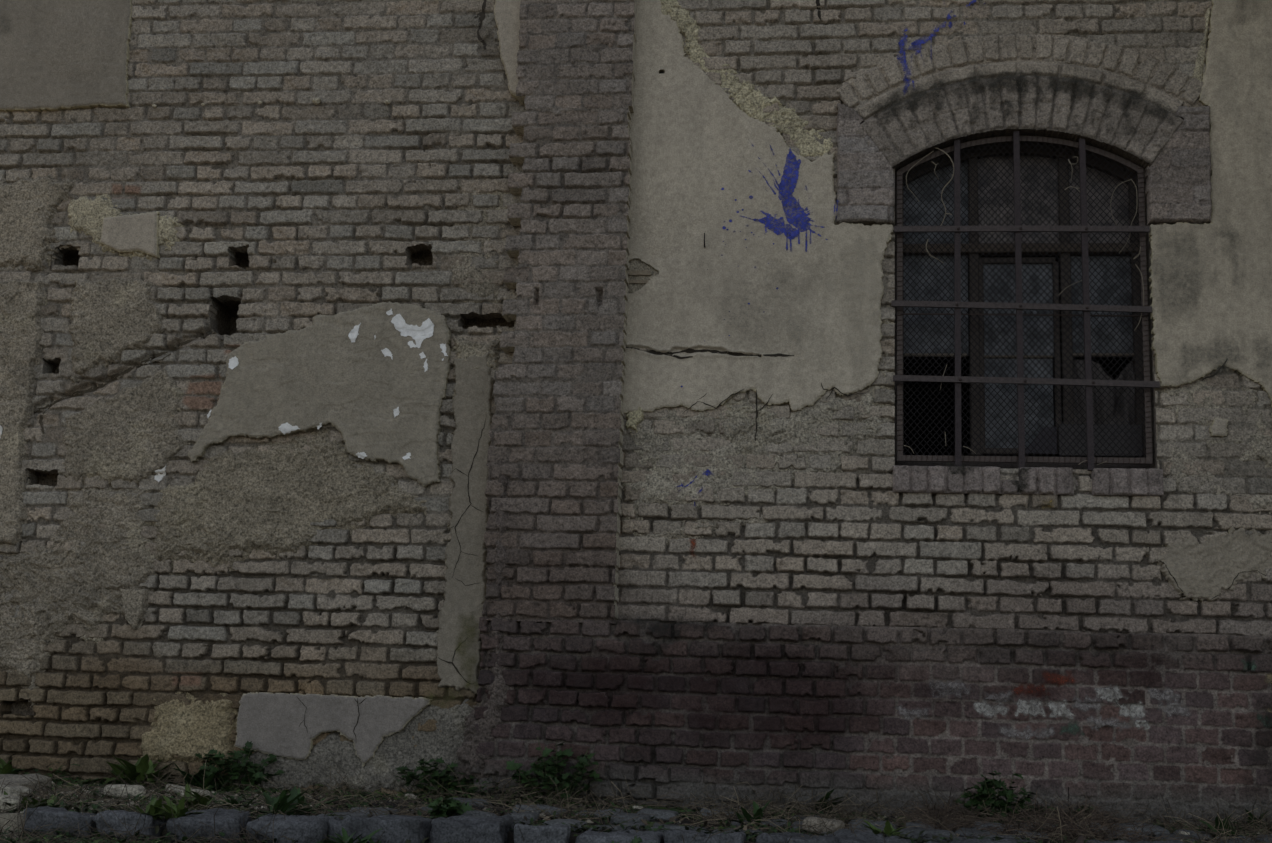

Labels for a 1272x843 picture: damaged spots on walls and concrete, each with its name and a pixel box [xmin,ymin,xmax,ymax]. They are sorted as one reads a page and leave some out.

flaking render [660,0,833,157]
flaking render [67,193,191,261]
spalling [50,250,81,271]
spalling [226,252,249,271]
spalling [410,250,433,266]
crack [626,347,794,359]
crack [684,389,773,441]
flaking render [0,294,514,719]
crack [449,419,486,586]
flaking render [140,445,515,795]
crack [438,637,471,684]